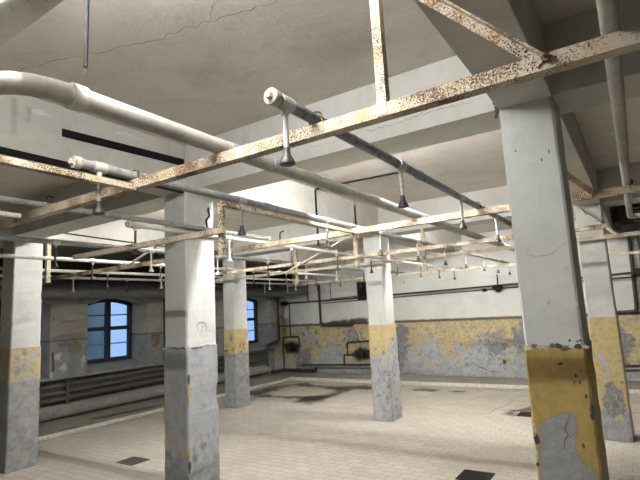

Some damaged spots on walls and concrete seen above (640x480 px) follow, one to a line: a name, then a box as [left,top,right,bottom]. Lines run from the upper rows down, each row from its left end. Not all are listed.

crack [19,0,291,72]
peeling [49,353,68,380]
peeling [295,325,363,372]
peeling [370,320,589,421]
peeling [598,353,627,417]
peeling [532,412,600,480]